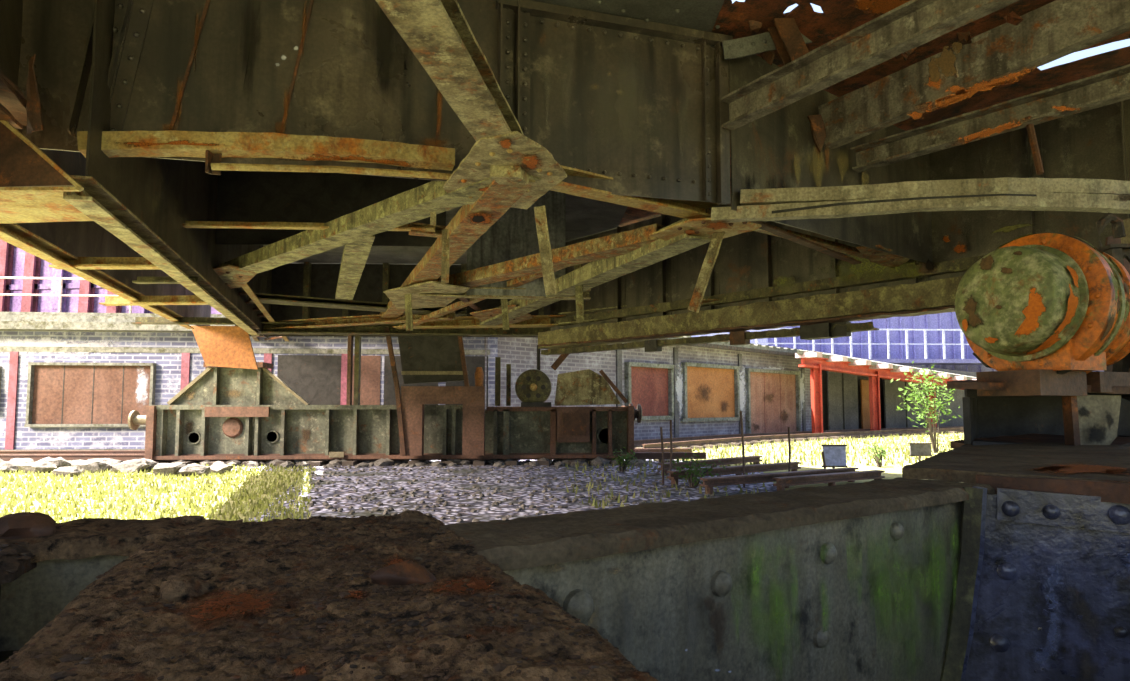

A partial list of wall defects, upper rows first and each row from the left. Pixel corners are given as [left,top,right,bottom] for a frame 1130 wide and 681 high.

corrosion [855,0,910,15]
corrosion [124,86,219,147]